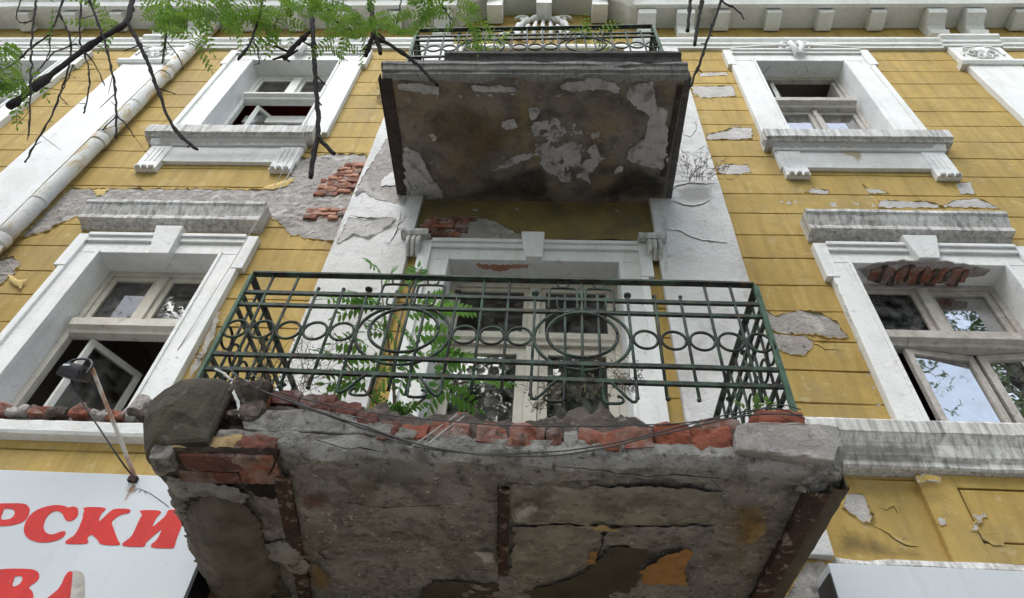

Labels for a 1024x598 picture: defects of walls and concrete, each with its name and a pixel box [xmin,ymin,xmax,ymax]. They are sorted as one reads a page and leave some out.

peeling [690,72,737,99]
peeling [493,107,604,185]
peeling [557,77,669,174]
flaking render [19,137,443,244]
spalling [419,208,522,239]
damp [607,170,661,196]
peeling [862,182,999,210]
peeling [758,284,874,389]
spalling [214,368,273,432]
crack [522,467,731,591]
peeling [841,493,875,525]
crack [872,502,920,547]